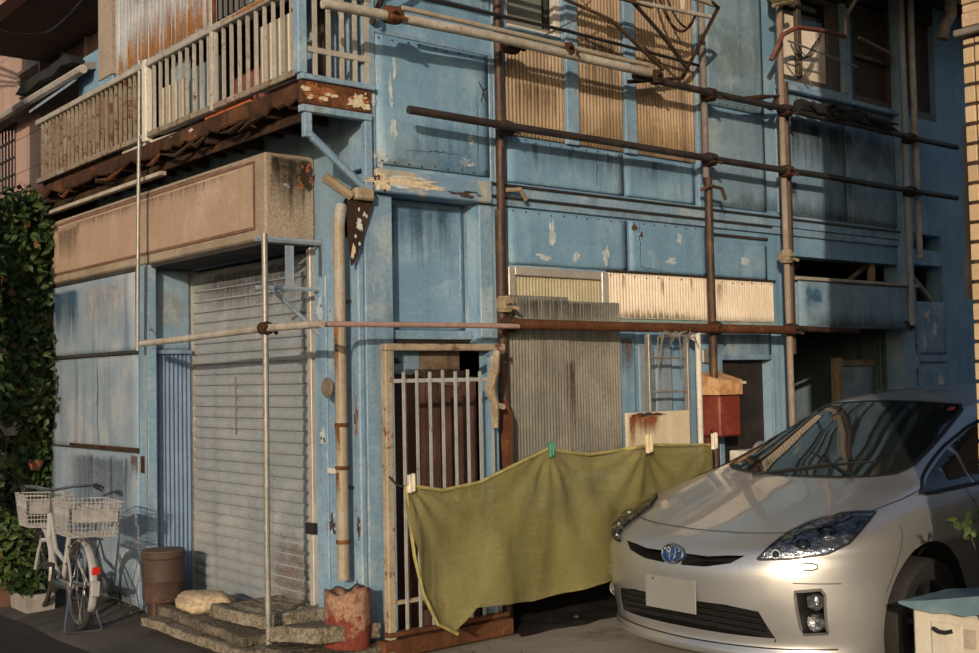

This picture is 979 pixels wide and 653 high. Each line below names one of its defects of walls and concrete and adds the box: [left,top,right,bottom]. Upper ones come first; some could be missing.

rust [118,0,209,74]
peeling [301,56,398,141]
leakage [272,157,310,195]
rust [298,162,315,191]
peeling [362,148,481,199]
peeling [351,207,368,259]
leakage [53,291,76,321]
rust [630,415,658,434]